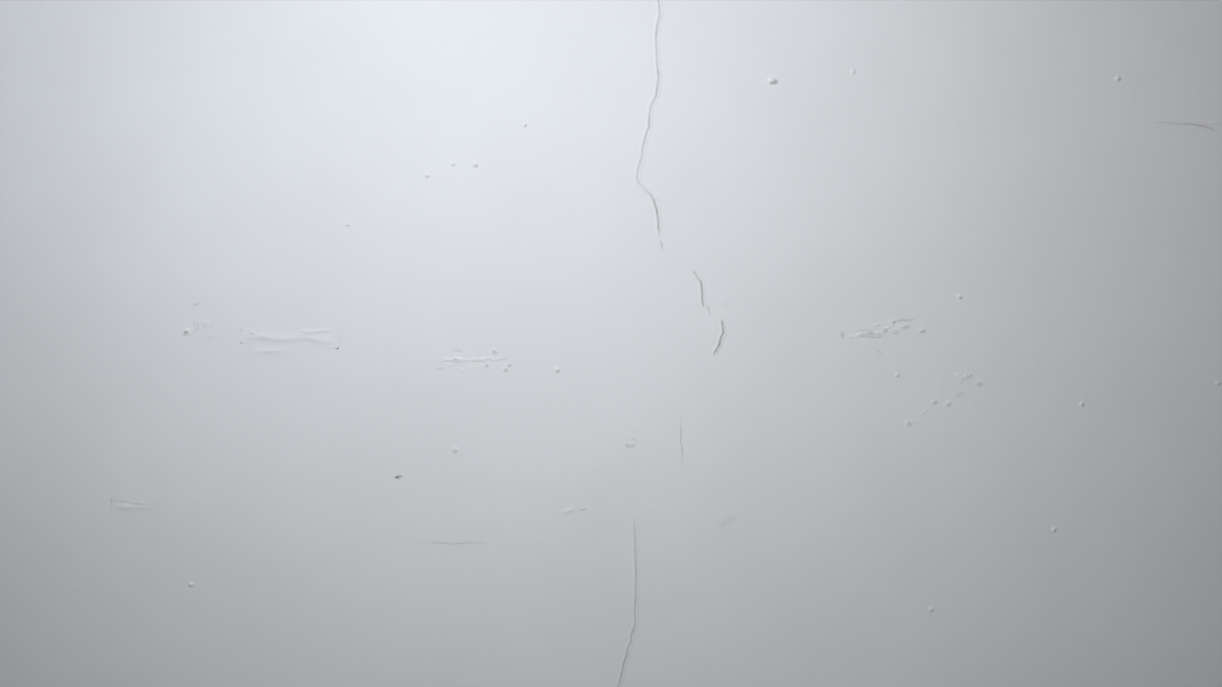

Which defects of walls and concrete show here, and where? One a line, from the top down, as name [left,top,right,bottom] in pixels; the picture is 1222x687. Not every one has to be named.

crack [633,0,664,237]
crack [689,267,727,358]
crack [615,516,640,687]